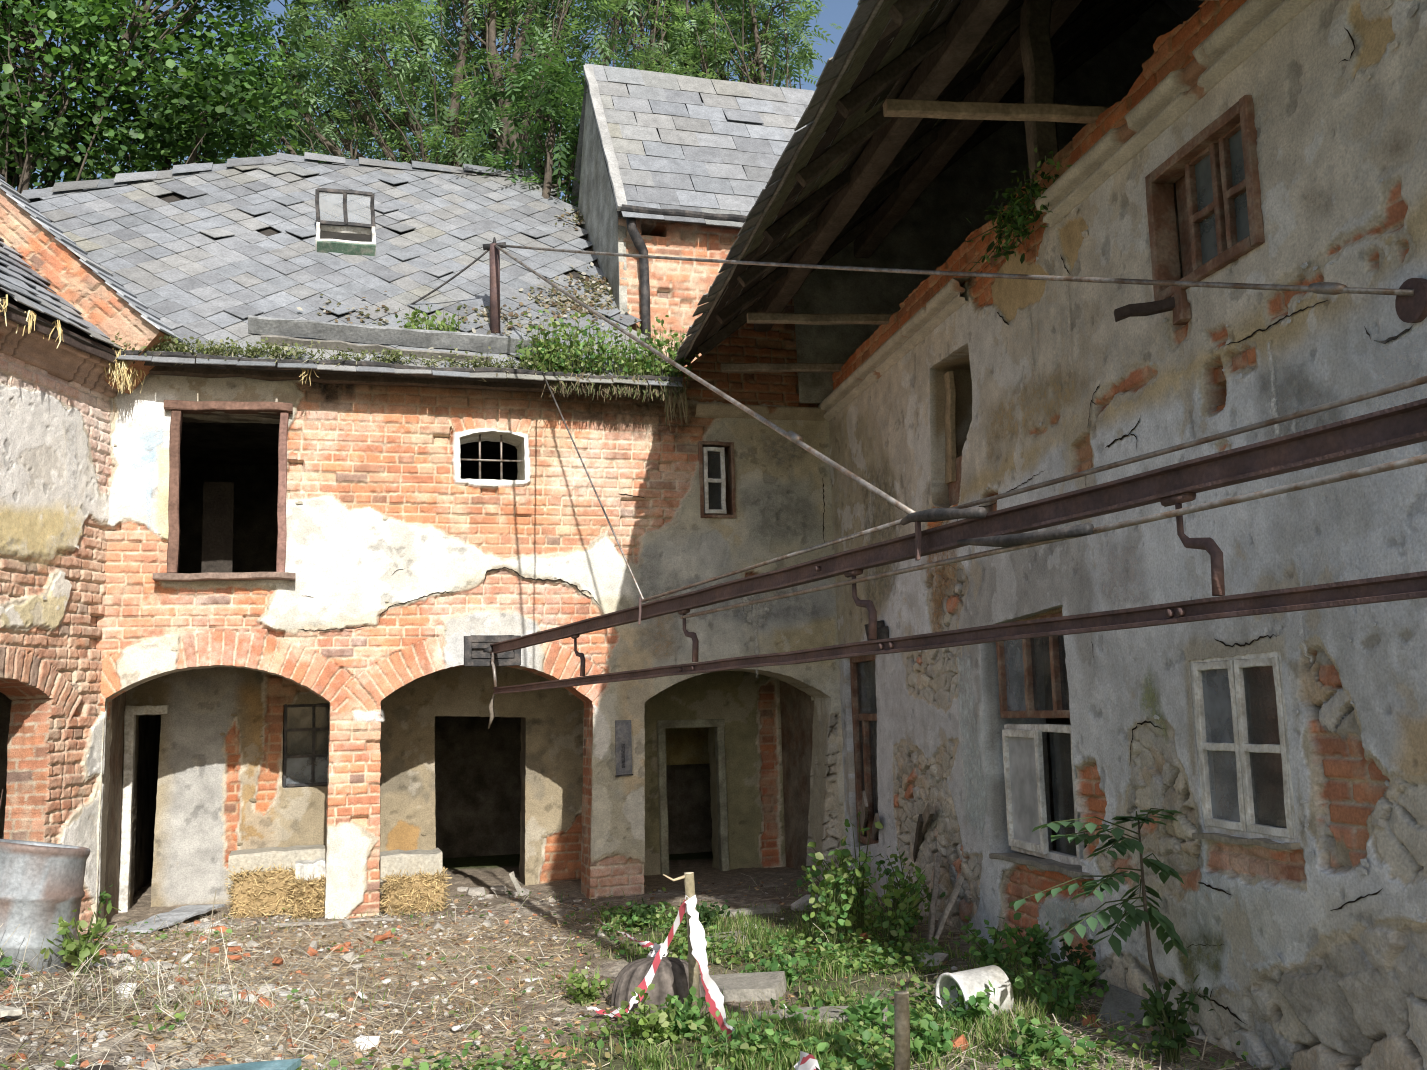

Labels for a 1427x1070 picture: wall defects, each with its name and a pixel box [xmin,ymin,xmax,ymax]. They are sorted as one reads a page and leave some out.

peeling [1336,0,1427,118]
flaking render [832,0,1247,391]
flaking render [1353,217,1423,288]
flaking render [1161,293,1265,455]
crack [1227,300,1328,345]
crack [1364,324,1414,344]
crack [1085,382,1141,485]
flaking render [0,298,820,919]
crack [1215,634,1279,647]
flaking render [890,548,1427,1070]
flaking render [77,862,100,936]
crack [1330,888,1383,911]